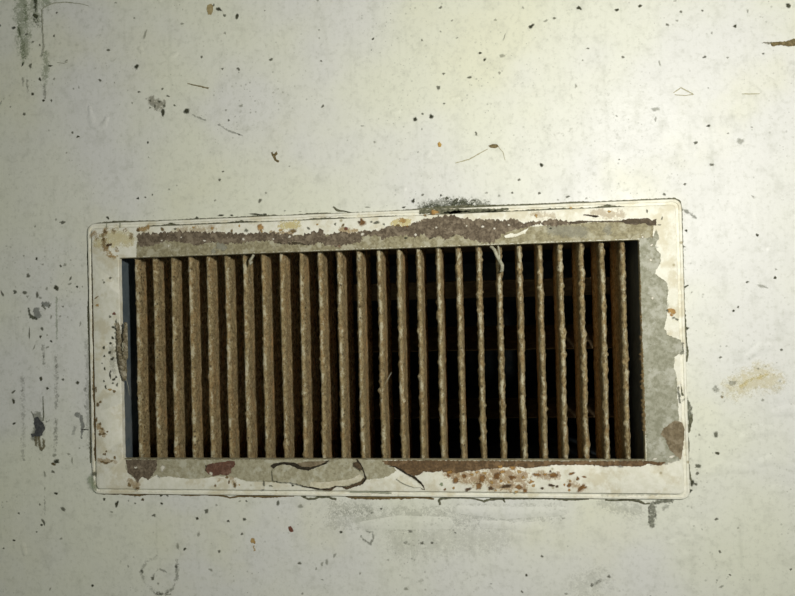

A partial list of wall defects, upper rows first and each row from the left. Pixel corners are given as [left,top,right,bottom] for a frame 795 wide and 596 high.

corrosion [257,220,318,234]
corrosion [334,218,411,233]
peeling [136,214,685,465]
peeling [125,458,396,491]
corrosion [382,460,665,493]